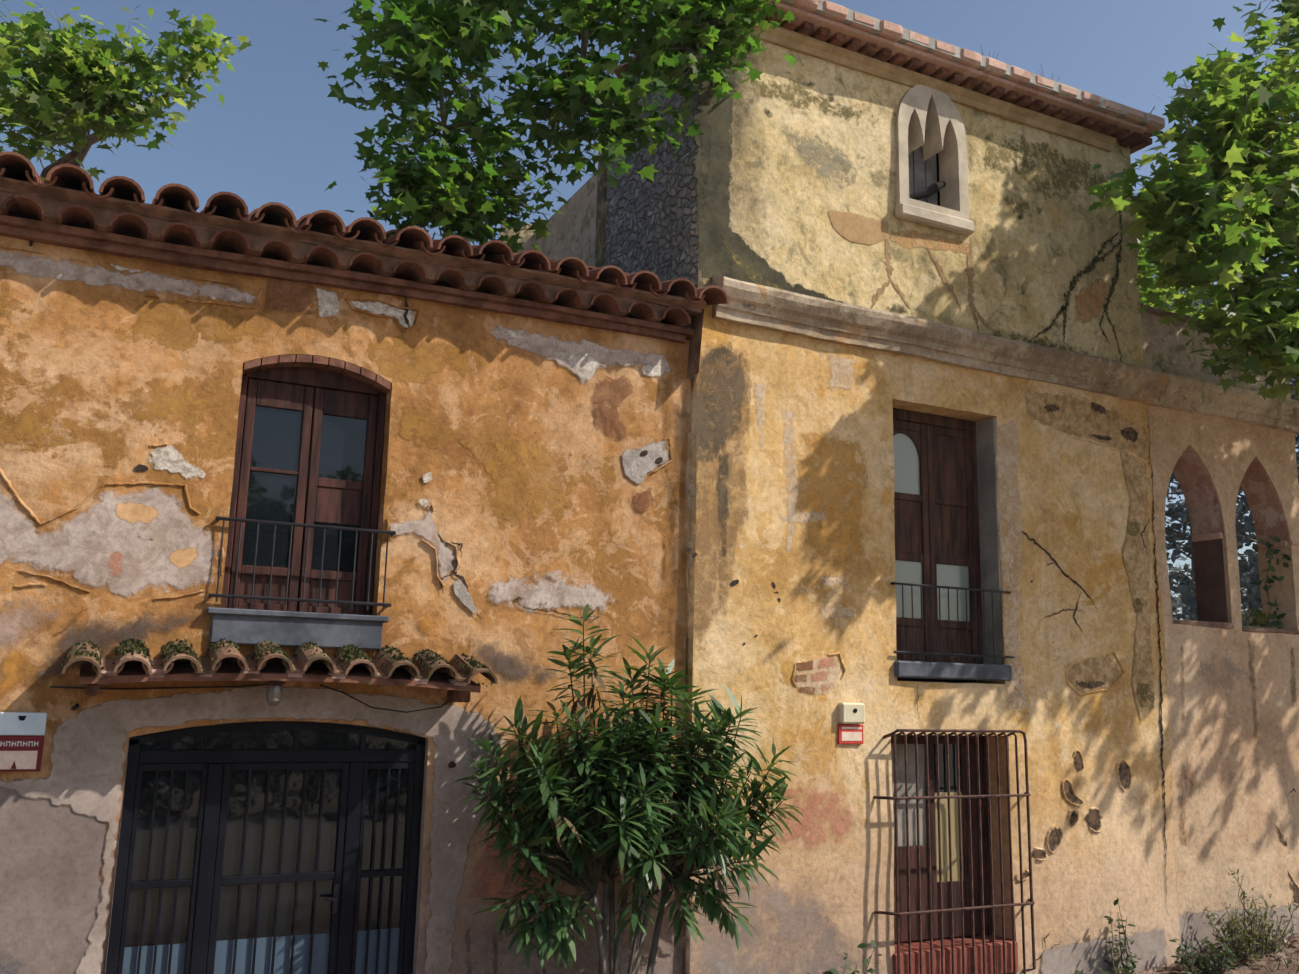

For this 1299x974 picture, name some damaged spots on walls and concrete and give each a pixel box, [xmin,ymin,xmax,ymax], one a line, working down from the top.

damp [983,134,1113,219]
crack [871,238,911,309]
crack [925,239,1002,336]
crack [1035,210,1123,362]
flaking render [0,442,225,646]
flaking render [384,499,477,614]
damp [489,325,765,632]
flaking render [622,437,673,484]
damp [781,411,867,572]
crack [1005,521,1097,631]
peeling [1015,749,1102,881]
peeling [1115,759,1132,792]